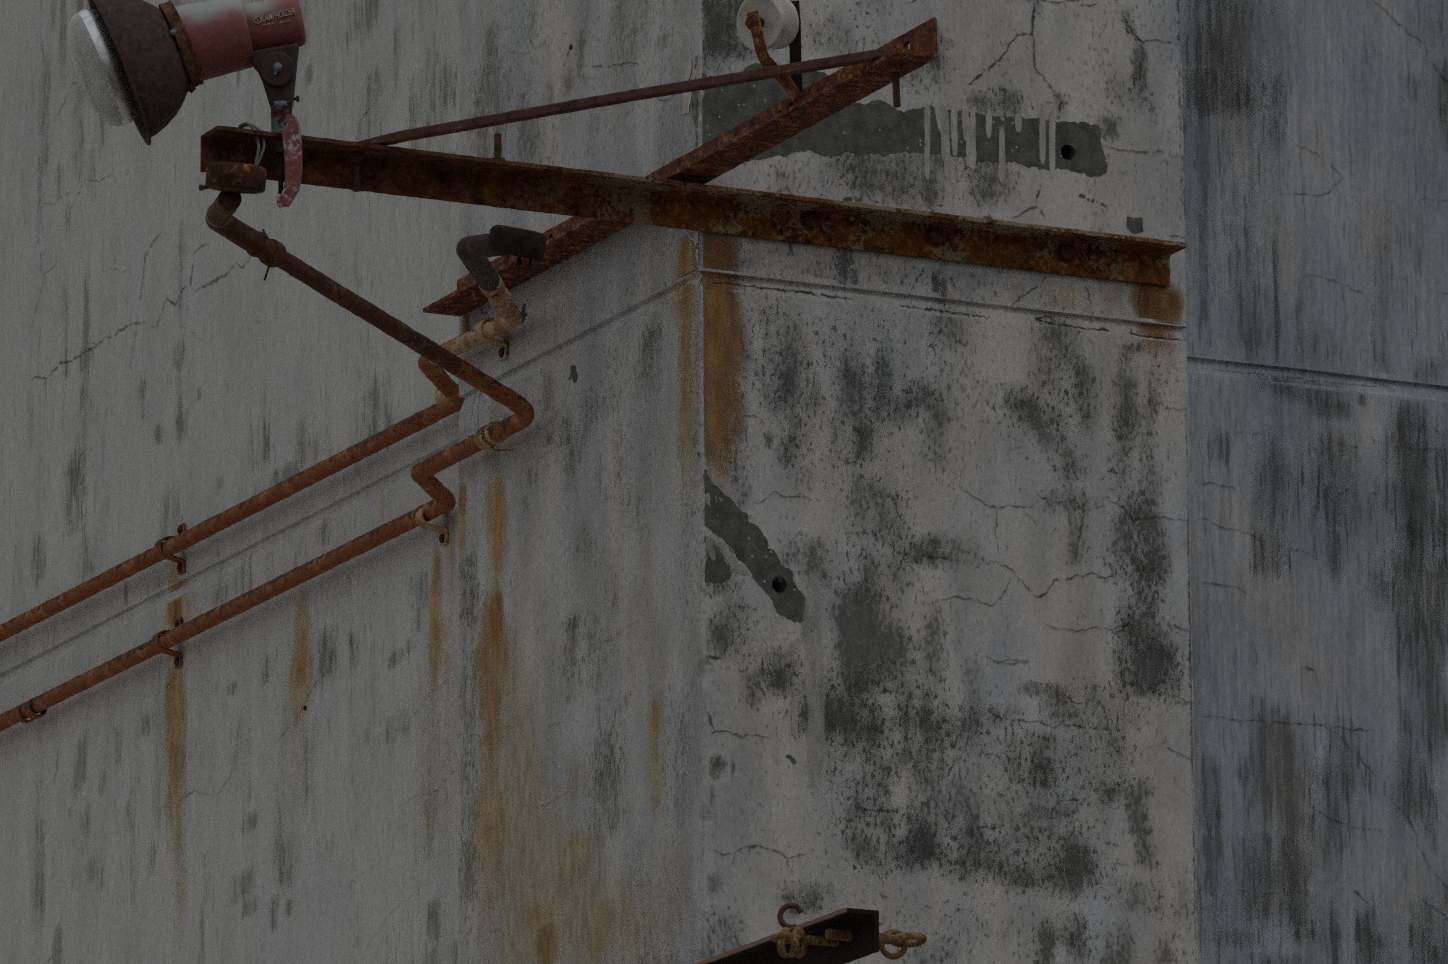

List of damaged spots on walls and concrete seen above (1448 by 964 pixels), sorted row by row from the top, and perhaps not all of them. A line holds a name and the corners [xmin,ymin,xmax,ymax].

crack [969,0,1172,110]
crack [32,233,250,386]
water stain [1039,318,1095,423]
corrosion [1133,284,1182,343]
water stain [1118,376,1158,502]
corrosion [486,484,504,559]
corrosion [168,573,183,625]
corrosion [480,593,506,755]
water stain [1119,538,1180,694]
water stain [1398,526,1448,747]
corrosion [166,676,184,810]
water stain [1047,836,1099,897]